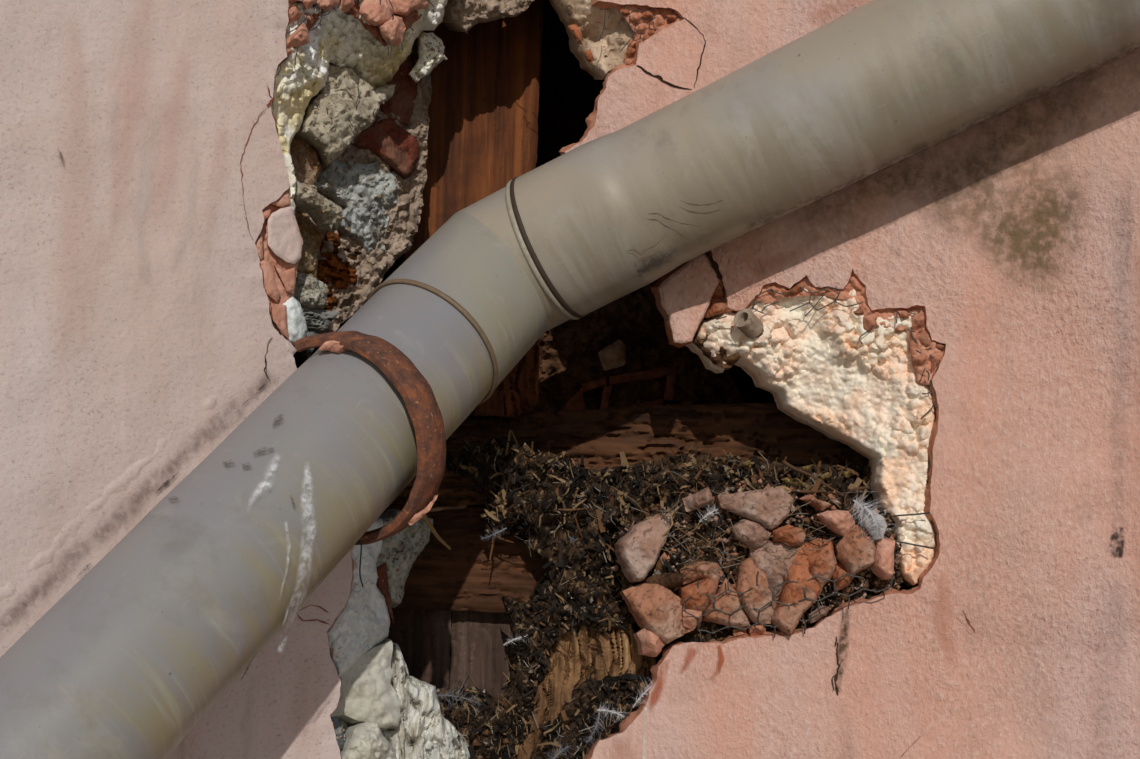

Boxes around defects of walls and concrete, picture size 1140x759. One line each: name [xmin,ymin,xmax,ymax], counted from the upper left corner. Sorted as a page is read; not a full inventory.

flaking render [286,0,429,57]
spalling [536,0,605,168]
flaking render [612,5,678,65]
crack [637,17,706,90]
crack [240,85,275,241]
flaking render [255,188,320,369]
flaking render [756,275,945,386]
spalling [729,365,776,404]
crack [831,636,842,695]